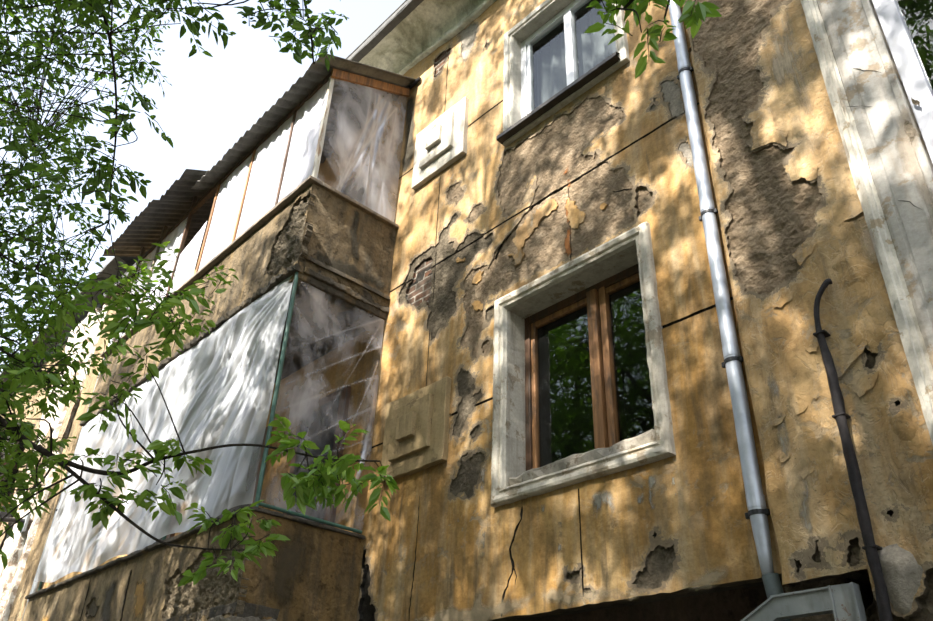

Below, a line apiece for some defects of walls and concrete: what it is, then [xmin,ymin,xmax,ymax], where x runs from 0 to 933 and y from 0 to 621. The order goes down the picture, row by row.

spalling [434,23,478,77]
spalling [650,79,685,118]
spalling [685,0,823,307]
spalling [266,190,316,275]
spalling [399,96,654,359]
spalling [451,368,483,439]
spalling [450,451,485,498]
spalling [162,516,253,621]
spalling [358,549,376,621]
crack [501,507,523,617]
spalling [632,532,676,589]
spalling [891,568,933,621]